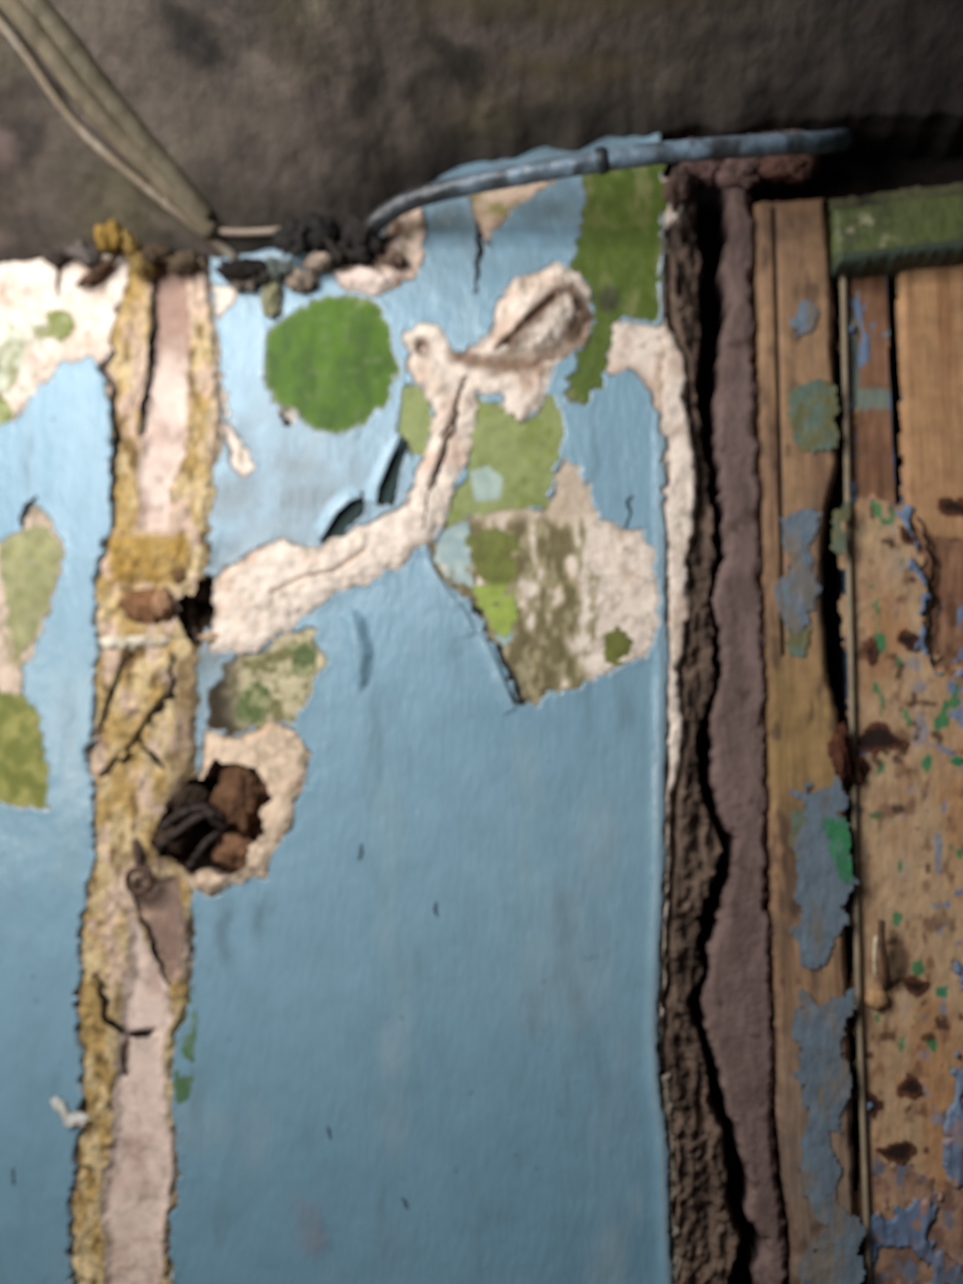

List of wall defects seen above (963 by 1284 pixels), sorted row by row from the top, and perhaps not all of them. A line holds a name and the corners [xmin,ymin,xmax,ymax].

crack [95,649,175,777]
flaking render [0,154,821,1284]
peeling [786,379,840,454]
peeling [774,497,963,1284]